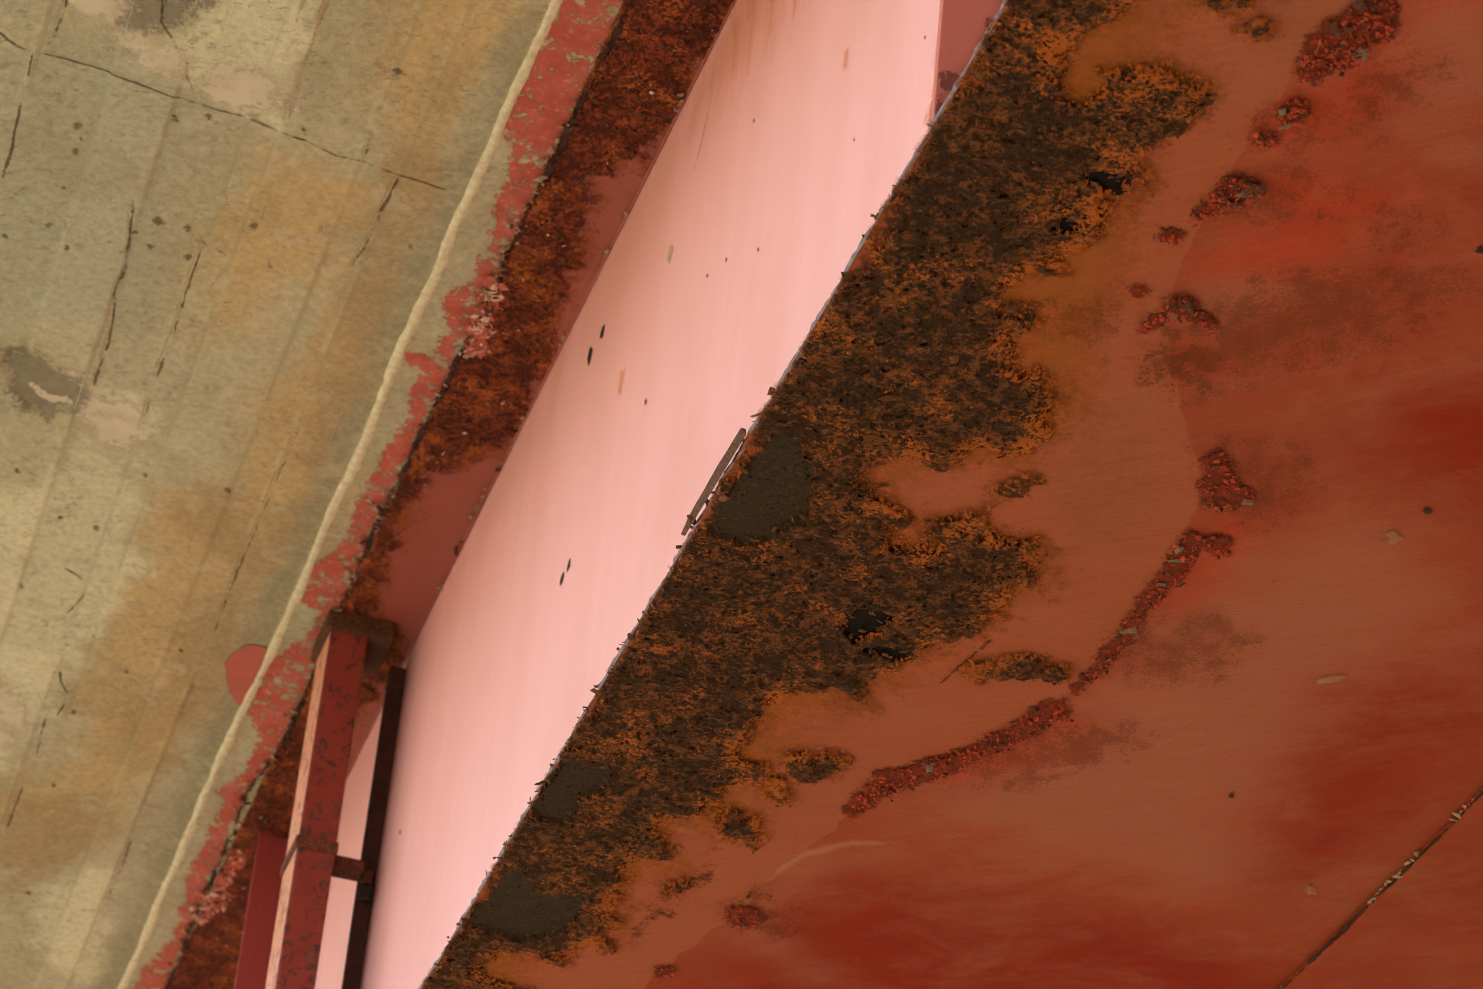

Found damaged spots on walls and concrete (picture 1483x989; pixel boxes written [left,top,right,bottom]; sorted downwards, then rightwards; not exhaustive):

spalling [0,346,91,423]
crack [90,200,134,386]
spalling [115,0,218,37]
crack [0,0,446,262]
peeling [133,0,622,989]
crack [321,0,633,626]
rust [341,0,734,620]
rust [420,0,1234,989]
rust [1154,172,1267,248]
rust [1252,0,1401,152]
crack [164,668,315,989]
rust [167,665,316,989]